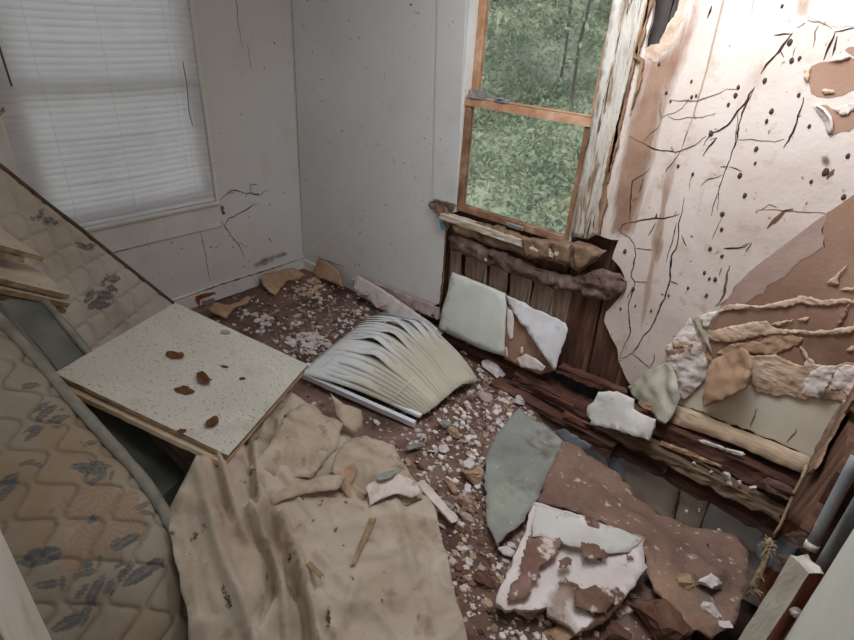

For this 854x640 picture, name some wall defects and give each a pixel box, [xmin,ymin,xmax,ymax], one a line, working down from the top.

spalling [644,0,687,62]
peeling [807,0,854,28]
peeling [803,47,854,137]
crack [175,0,304,301]
crack [619,20,854,367]
flaking render [452,222,607,272]
peeling [705,195,854,366]
peeling [628,362,681,424]
flaking render [709,470,757,491]